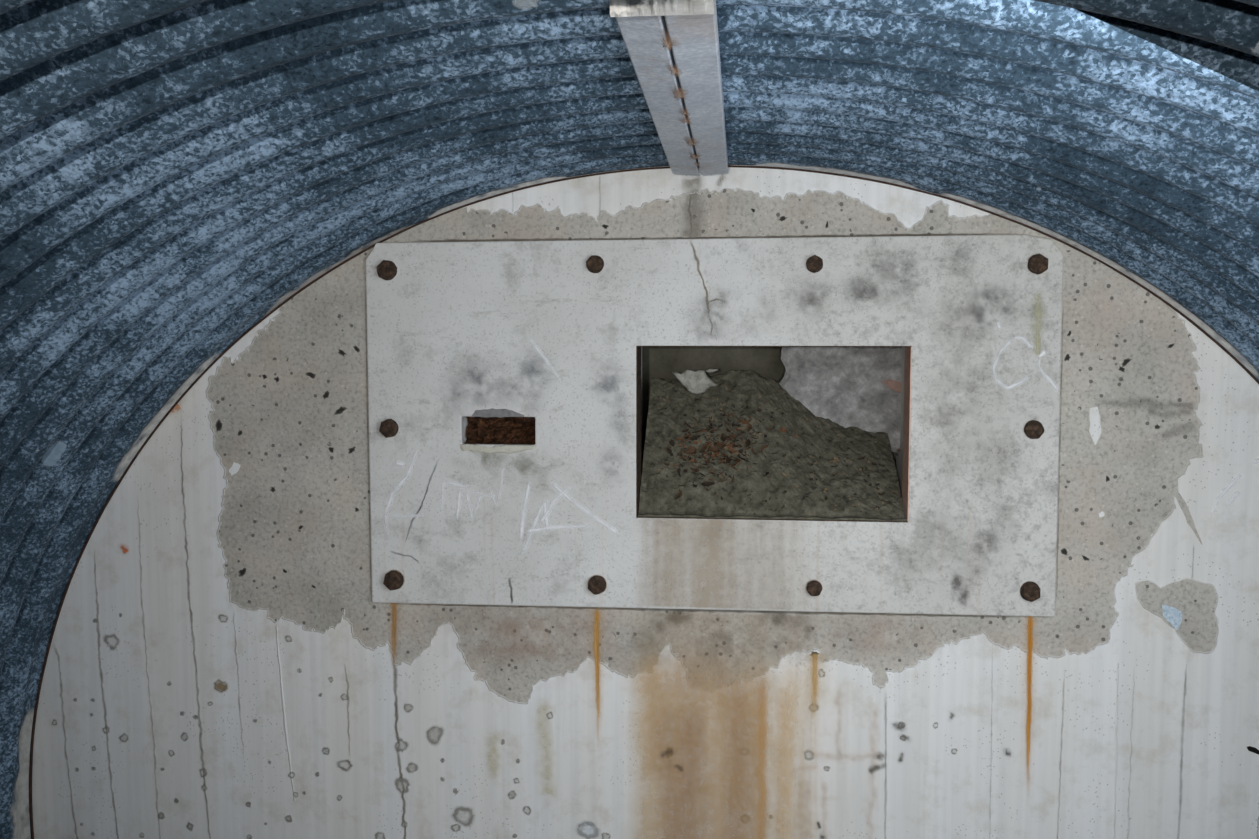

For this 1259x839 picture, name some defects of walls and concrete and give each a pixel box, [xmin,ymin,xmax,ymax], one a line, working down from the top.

crack [688,196,716,332]
peeling [205,187,1219,704]
crack [394,670,406,839]
rust [643,672,767,839]